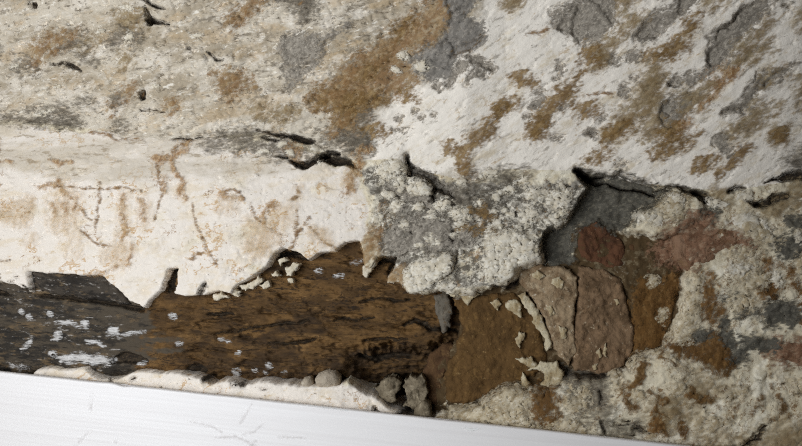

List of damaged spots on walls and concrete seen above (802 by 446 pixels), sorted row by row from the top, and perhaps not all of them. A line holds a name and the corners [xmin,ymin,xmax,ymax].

water stain [498,0,527,14]
crack [53,182,141,246]
crack [153,137,202,220]
peeling [213,257,303,301]
crack [221,129,356,252]
water stain [208,0,451,144]
crack [405,152,453,202]
water stain [439,69,540,183]
peeling [362,158,690,351]
water stain [522,0,802,446]
peeling [605,188,802,404]
peeling [443,332,594,435]